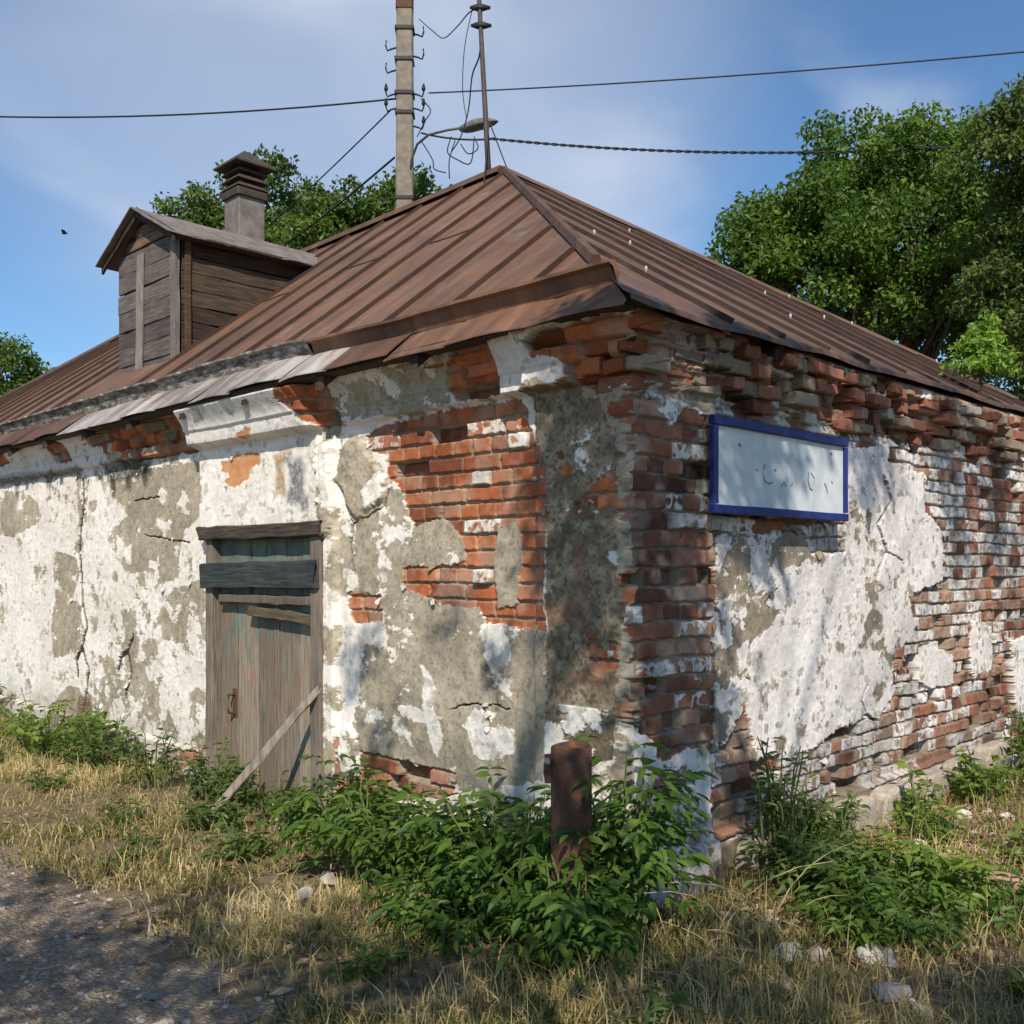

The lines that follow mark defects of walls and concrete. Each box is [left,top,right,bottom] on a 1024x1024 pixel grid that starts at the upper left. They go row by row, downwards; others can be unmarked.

crack [74,477,90,712]
peeling [43,414,206,768]
crack [116,633,134,697]
peeling [220,426,260,488]
peeling [331,343,549,807]
crack [450,702,510,728]
spalling [518,292,1024,845]
crack [875,474,903,581]